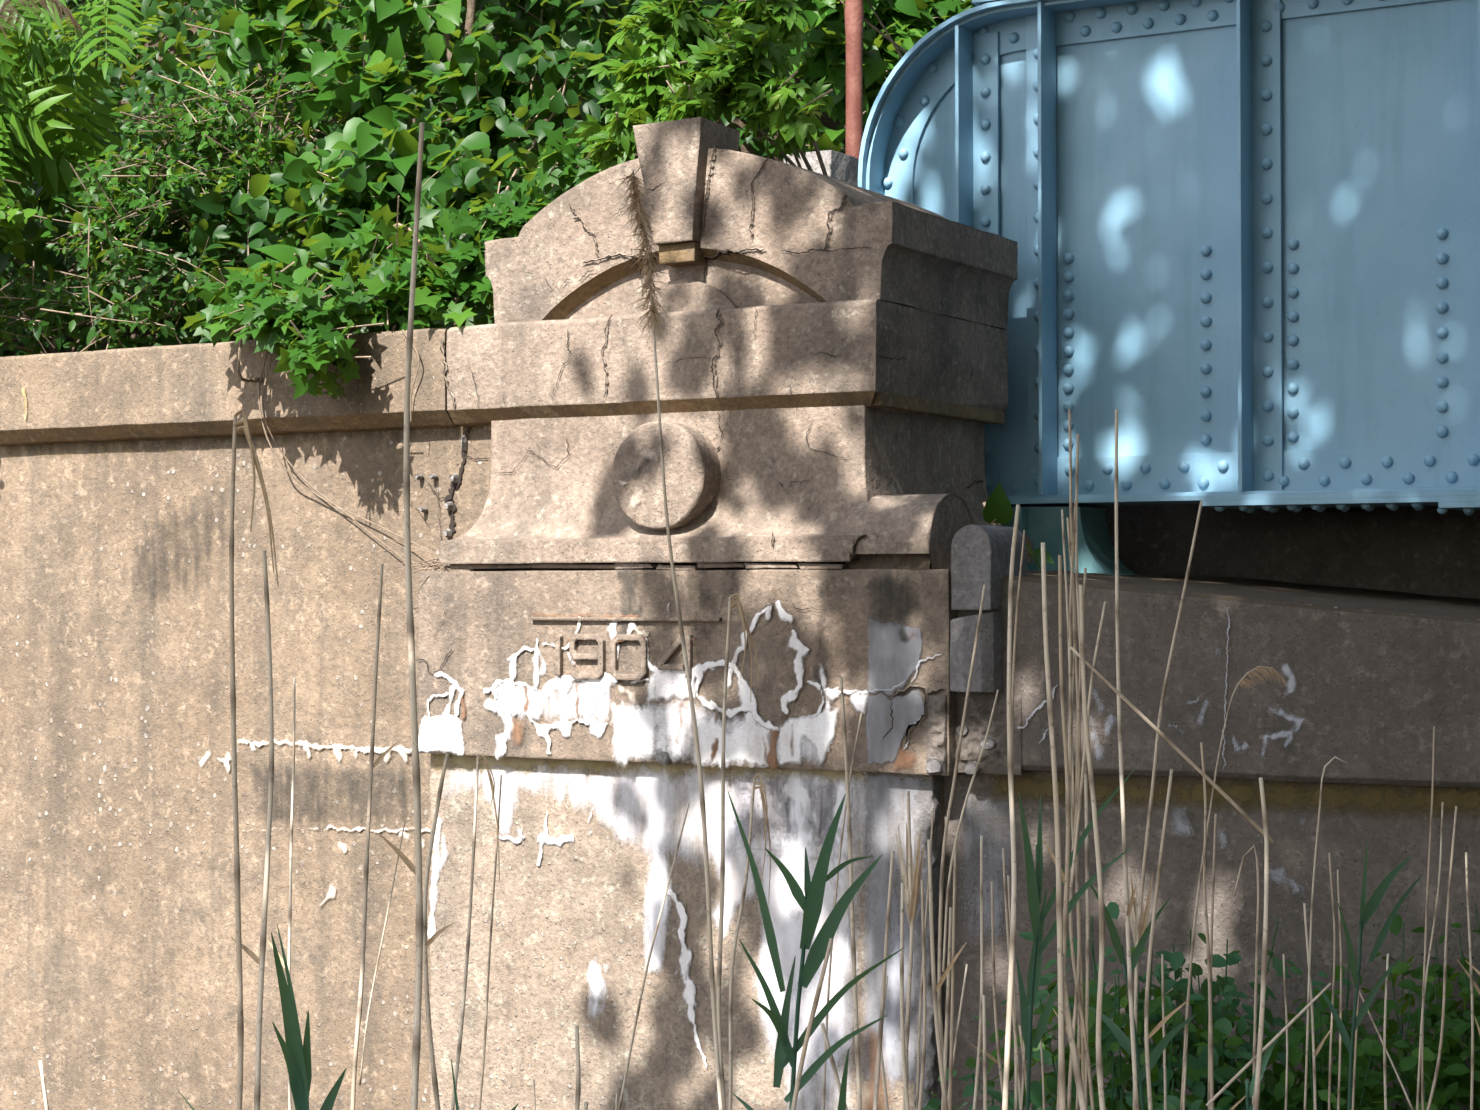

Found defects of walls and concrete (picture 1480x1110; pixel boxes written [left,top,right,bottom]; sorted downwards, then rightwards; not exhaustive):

crack [526,183,662,296]
crack [552,315,612,398]
crack [665,146,870,488]
crack [410,338,569,540]
water stain [608,569,648,653]
water stain [874,578,910,642]
water stain [238,600,921,1110]